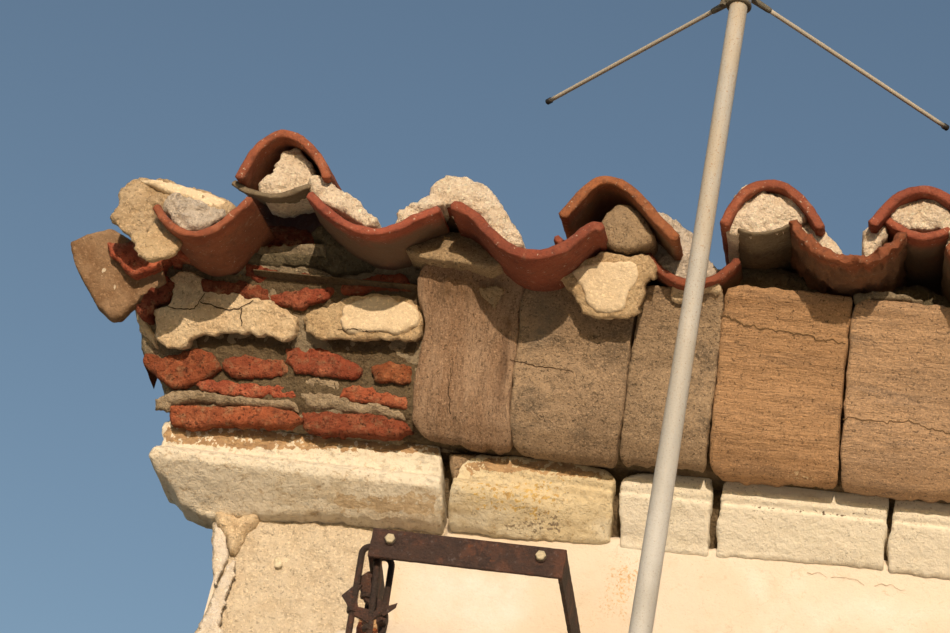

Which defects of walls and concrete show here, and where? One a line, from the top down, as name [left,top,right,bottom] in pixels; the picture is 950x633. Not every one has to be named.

crack [168,293,253,326]
crack [721,315,846,344]
crack [510,359,574,373]
crack [843,416,950,434]
spalling [194,486,448,633]
rust [382,560,404,629]